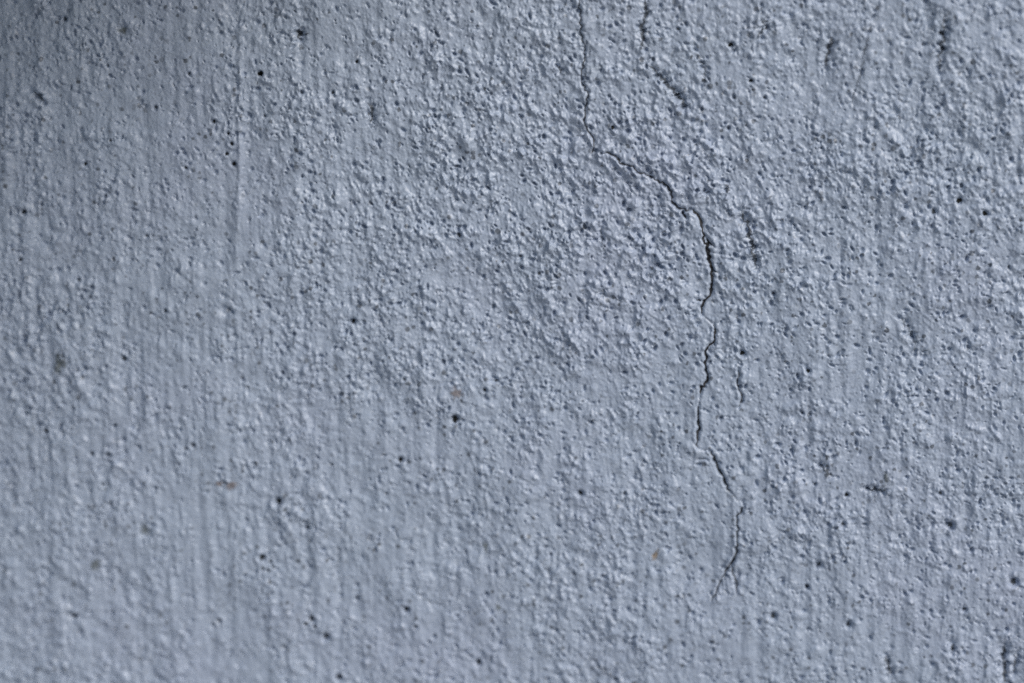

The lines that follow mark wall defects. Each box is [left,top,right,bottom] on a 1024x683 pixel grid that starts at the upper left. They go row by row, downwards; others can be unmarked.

crack [578,0,744,599]